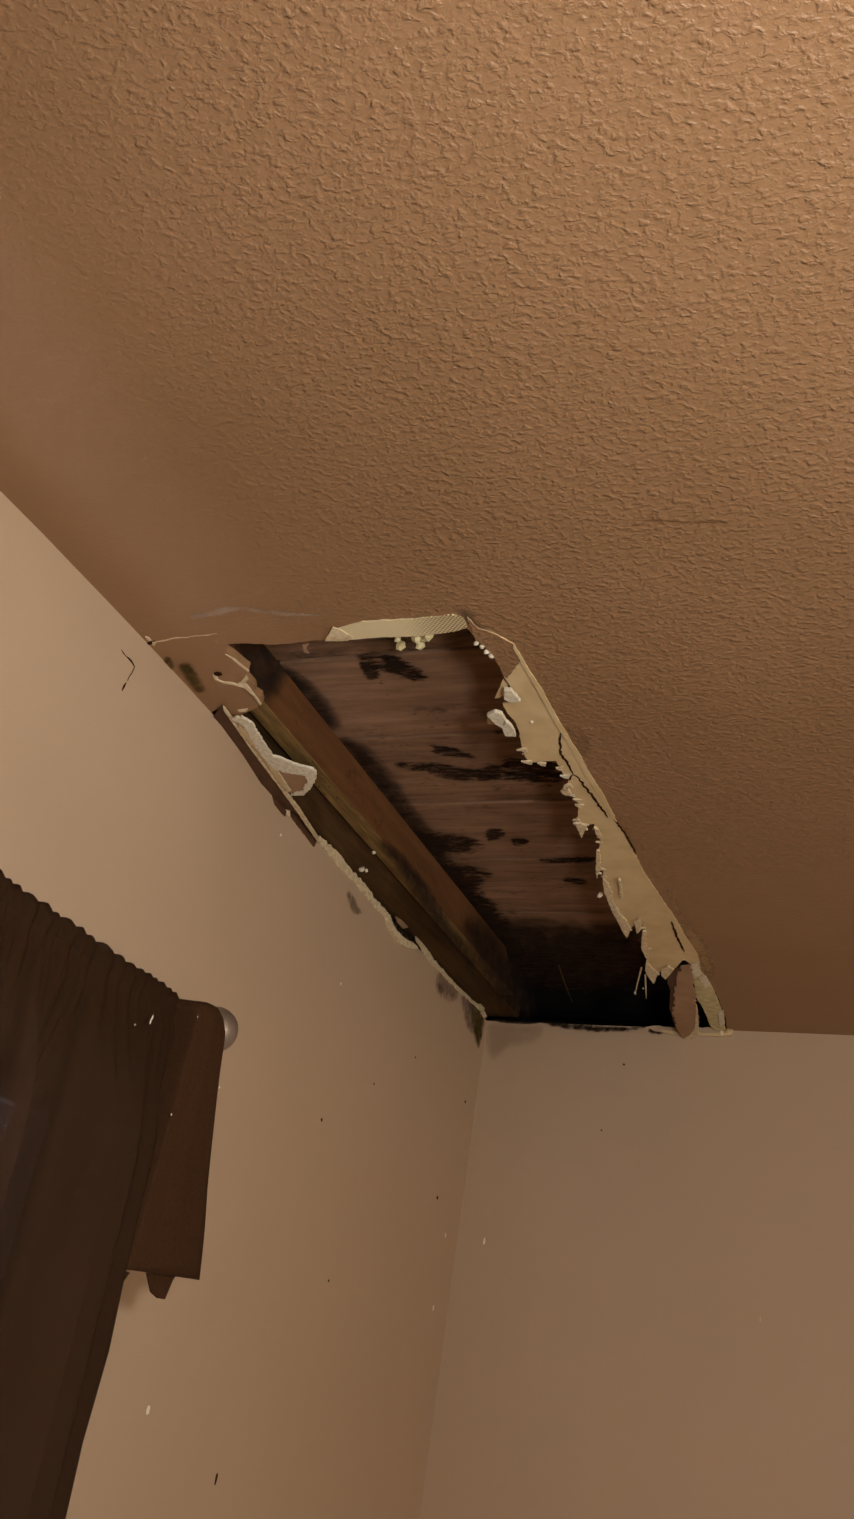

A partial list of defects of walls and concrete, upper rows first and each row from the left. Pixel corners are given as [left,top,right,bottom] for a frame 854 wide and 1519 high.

peeling [487,687,521,737]
peeling [213,704,392,921]
water stain [240,643,662,1046]
spalling [415,936,487,1018]
peeling [690,963,710,988]